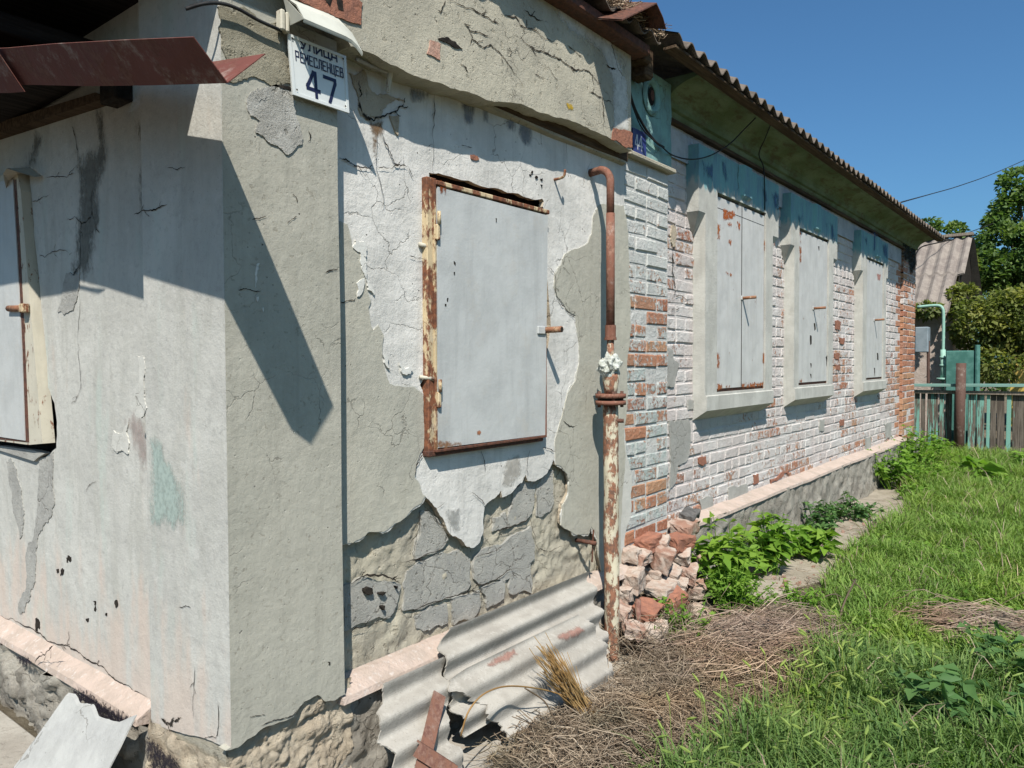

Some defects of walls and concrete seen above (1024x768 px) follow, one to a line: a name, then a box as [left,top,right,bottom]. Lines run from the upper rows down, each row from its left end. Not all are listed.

leakage [73,113,105,273]
flaking render [217,6,303,155]
peeling [352,240,375,297]
flaking render [349,70,404,136]
crack [343,85,435,211]
crack [438,0,623,121]
flaking render [611,128,633,148]
corrosion [717,209,740,245]
peeling [111,356,147,454]
flaking render [6,452,55,632]
spalling [362,585,398,610]